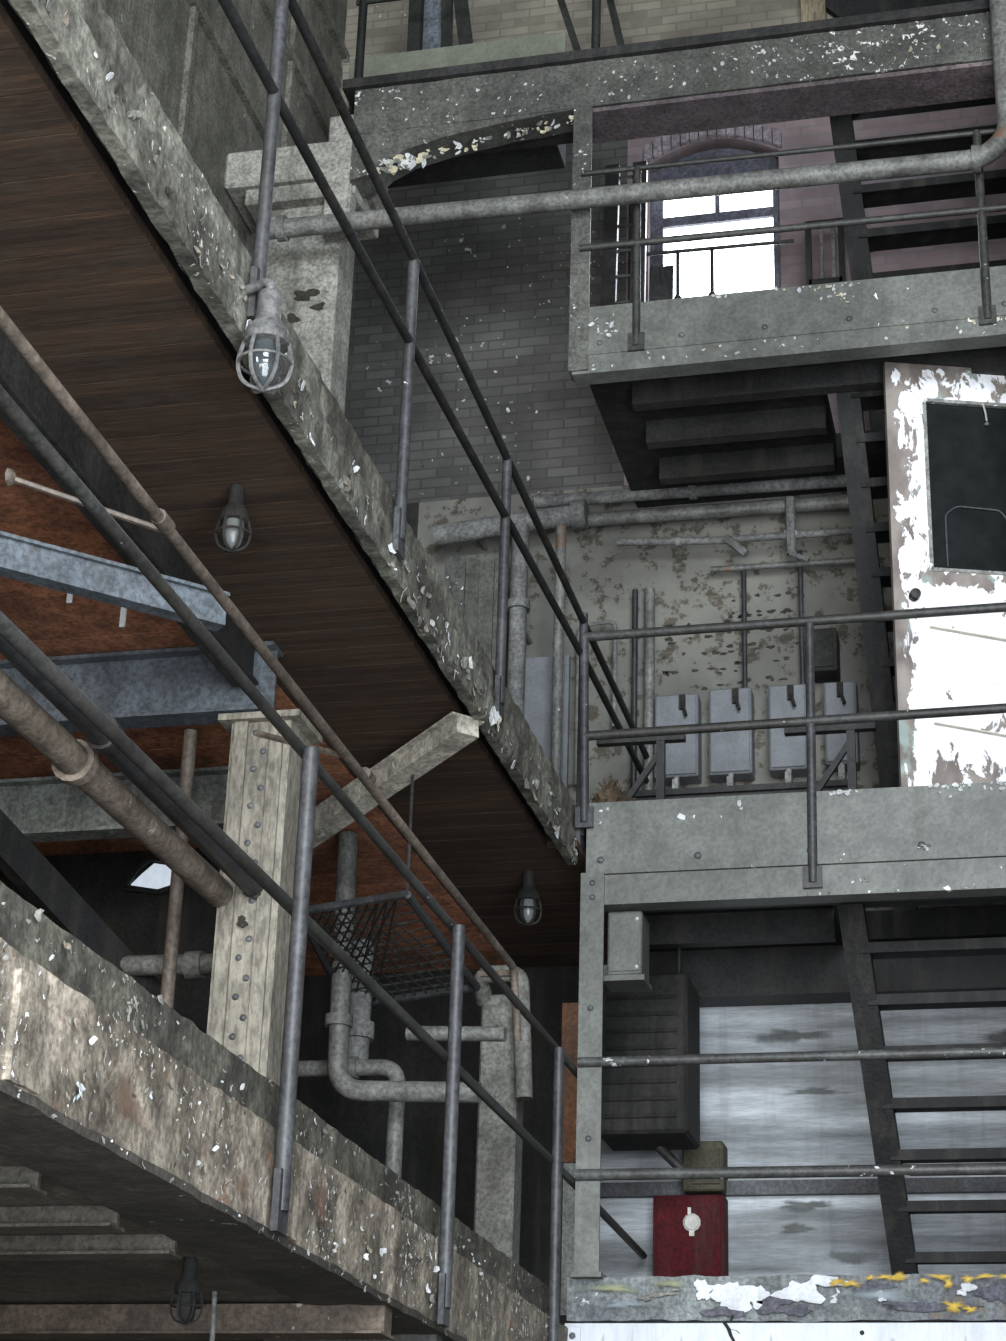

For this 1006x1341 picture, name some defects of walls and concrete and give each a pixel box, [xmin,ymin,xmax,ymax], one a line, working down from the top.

peeling [377,75,574,175]
spalling [638,1275,1006,1318]
crack [722,1315,740,1341]